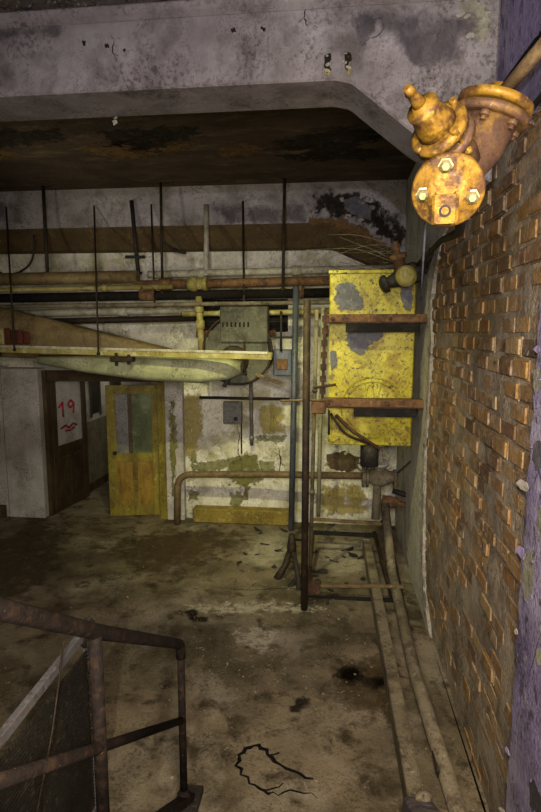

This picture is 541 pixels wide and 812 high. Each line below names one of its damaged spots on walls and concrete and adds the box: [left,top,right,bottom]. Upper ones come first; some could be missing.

leakage [355,13,474,62]
leakage [168,394,203,496]
leakage [227,452,263,500]
leakage [260,405,285,434]
spalling [400,107,541,812]
crack [234,743,317,798]